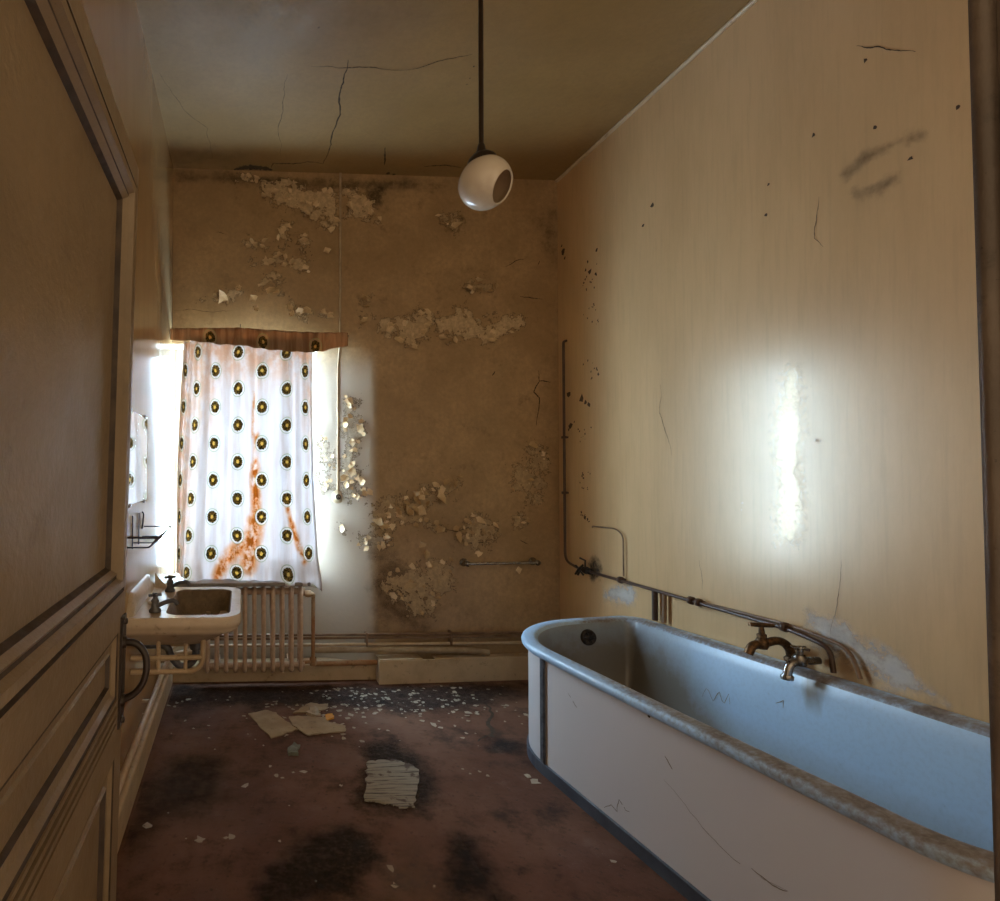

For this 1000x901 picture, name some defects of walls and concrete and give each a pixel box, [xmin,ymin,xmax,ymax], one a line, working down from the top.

crack [234,54,471,171]
peeling [230,172,382,274]
peeling [196,285,259,311]
peeling [371,300,528,349]
peeling [314,393,502,558]
peeling [377,541,458,628]